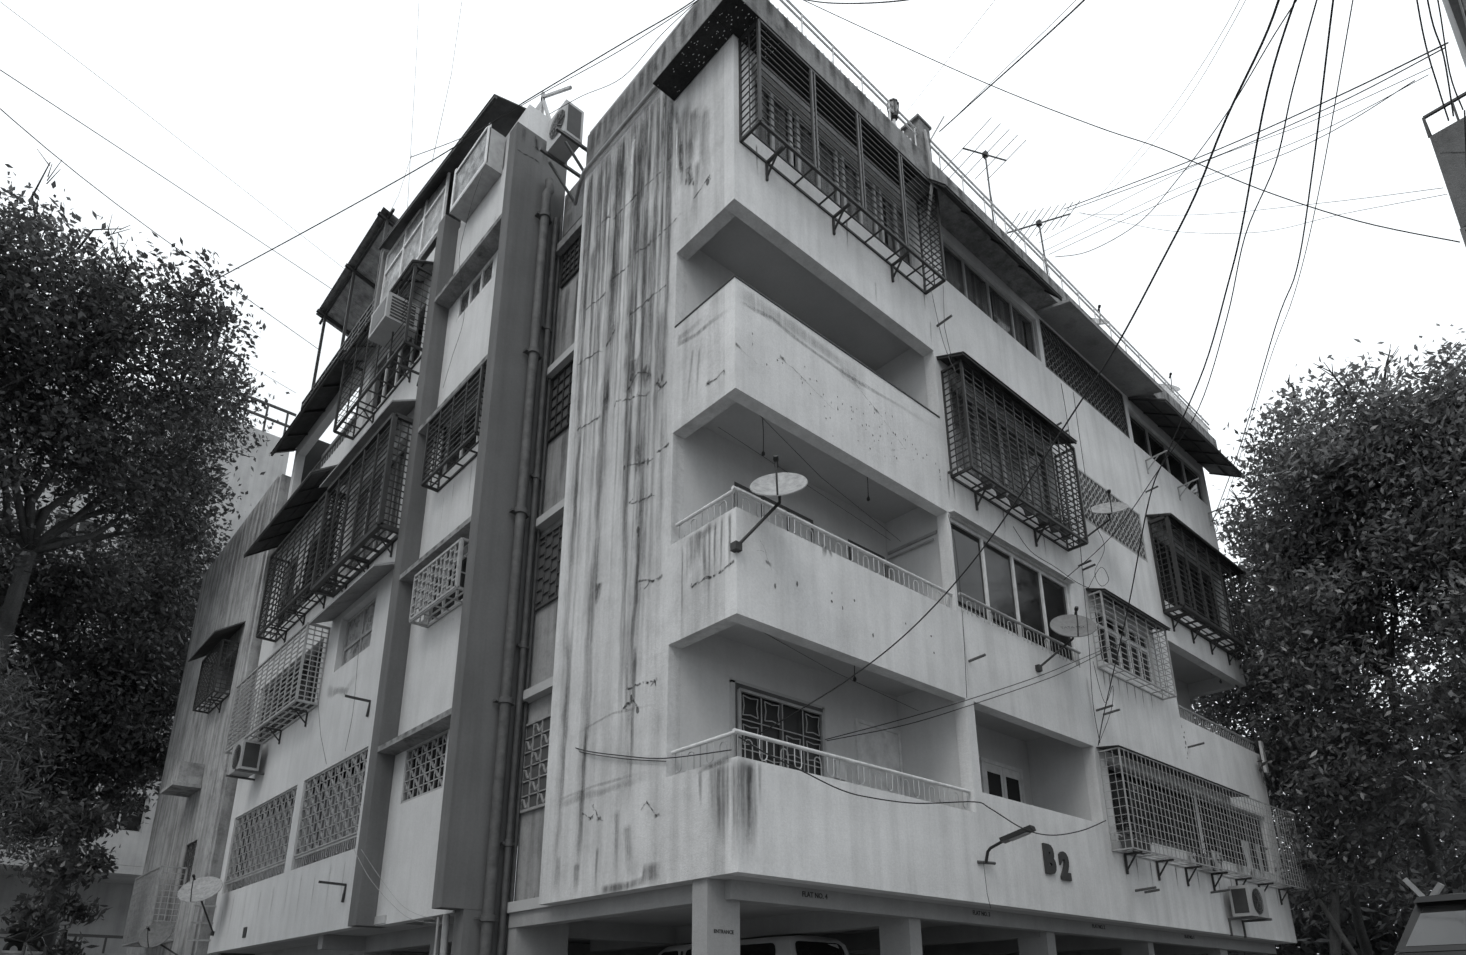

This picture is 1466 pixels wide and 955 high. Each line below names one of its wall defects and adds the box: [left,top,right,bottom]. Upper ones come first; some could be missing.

leakage [601,99,691,192]